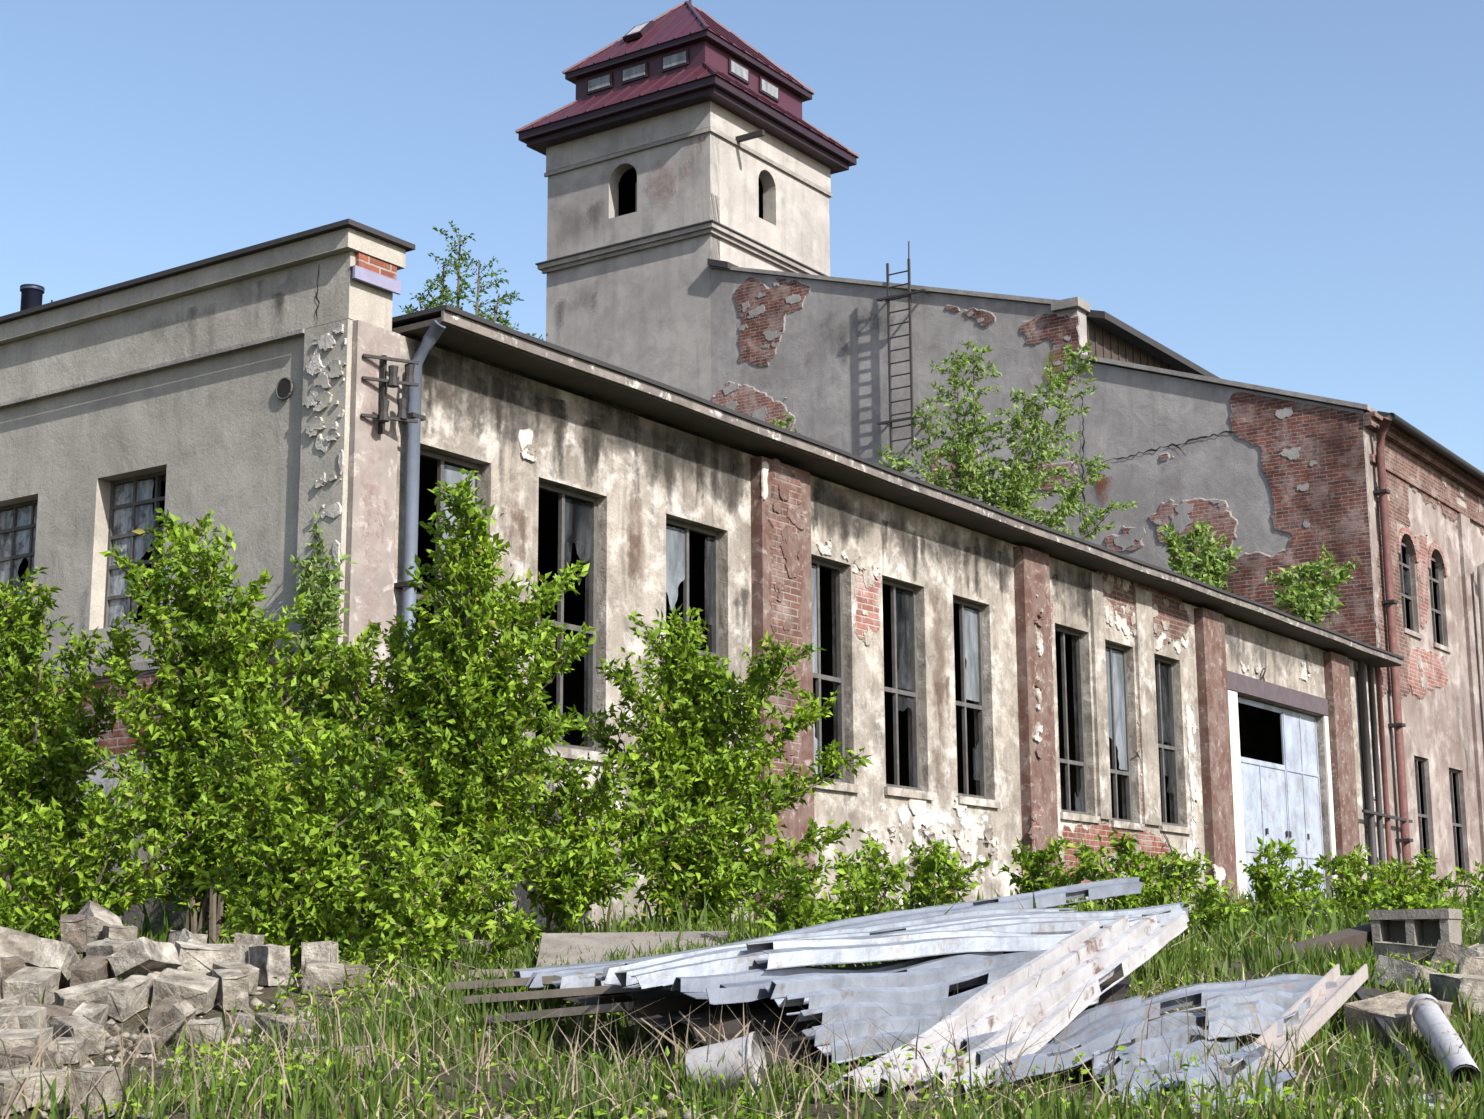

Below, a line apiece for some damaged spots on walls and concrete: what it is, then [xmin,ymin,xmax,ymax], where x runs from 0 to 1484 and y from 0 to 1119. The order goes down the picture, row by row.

flaking render [249,657,315,728]
flaking render [6,670,171,813]
peeling [273,746,301,802]
spalling [105,860,179,881]